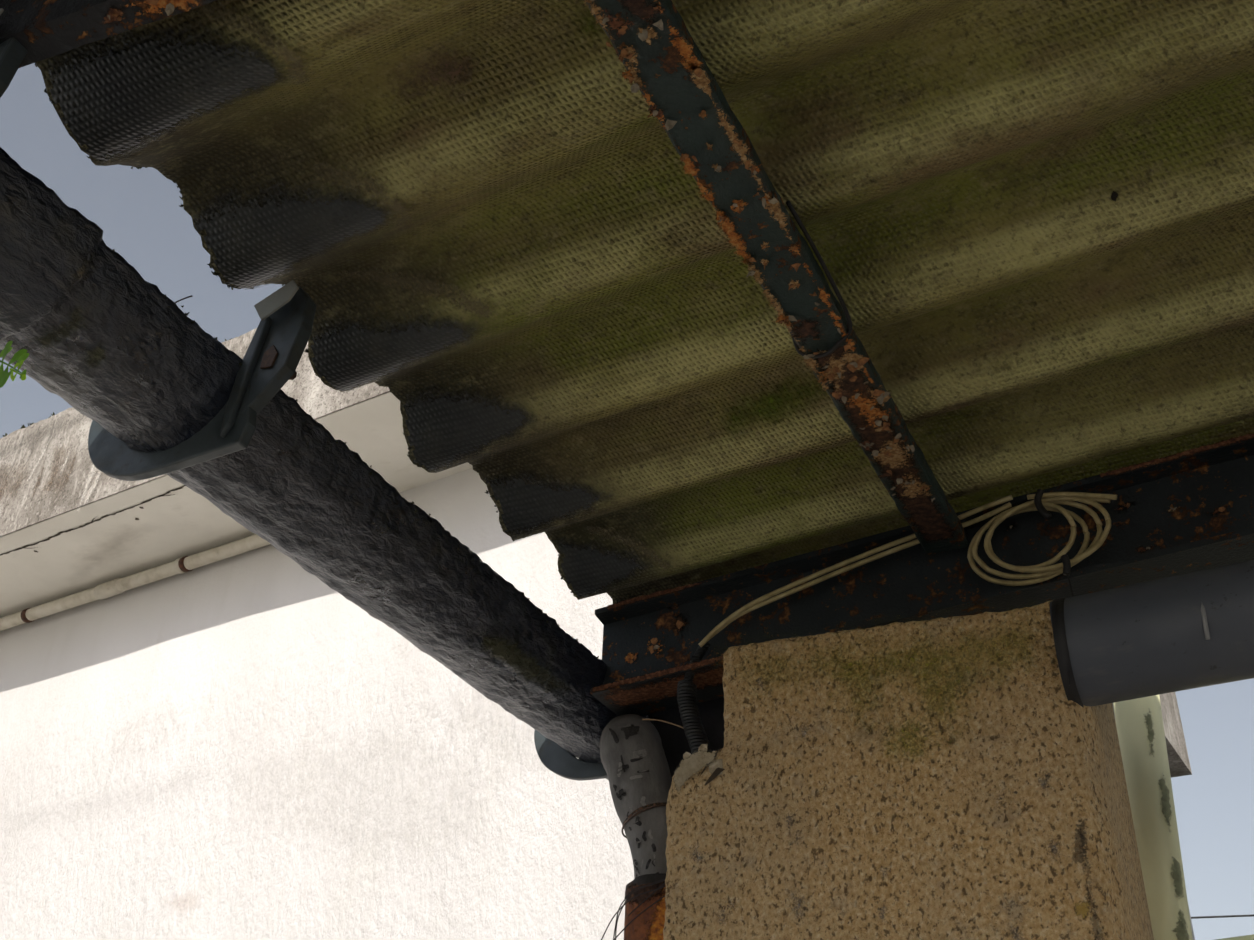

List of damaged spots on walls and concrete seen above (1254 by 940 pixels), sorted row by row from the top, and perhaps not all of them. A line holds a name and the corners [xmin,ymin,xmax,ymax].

corrosion [102,0,201,25]
leakage [49,2,307,164]
leakage [193,185,389,289]
corrosion [583,0,935,502]
leakage [311,270,491,391]
leakage [403,390,532,472]
corrosion [1099,433,1254,477]
leakage [486,474,669,603]
corrosion [624,884,666,940]